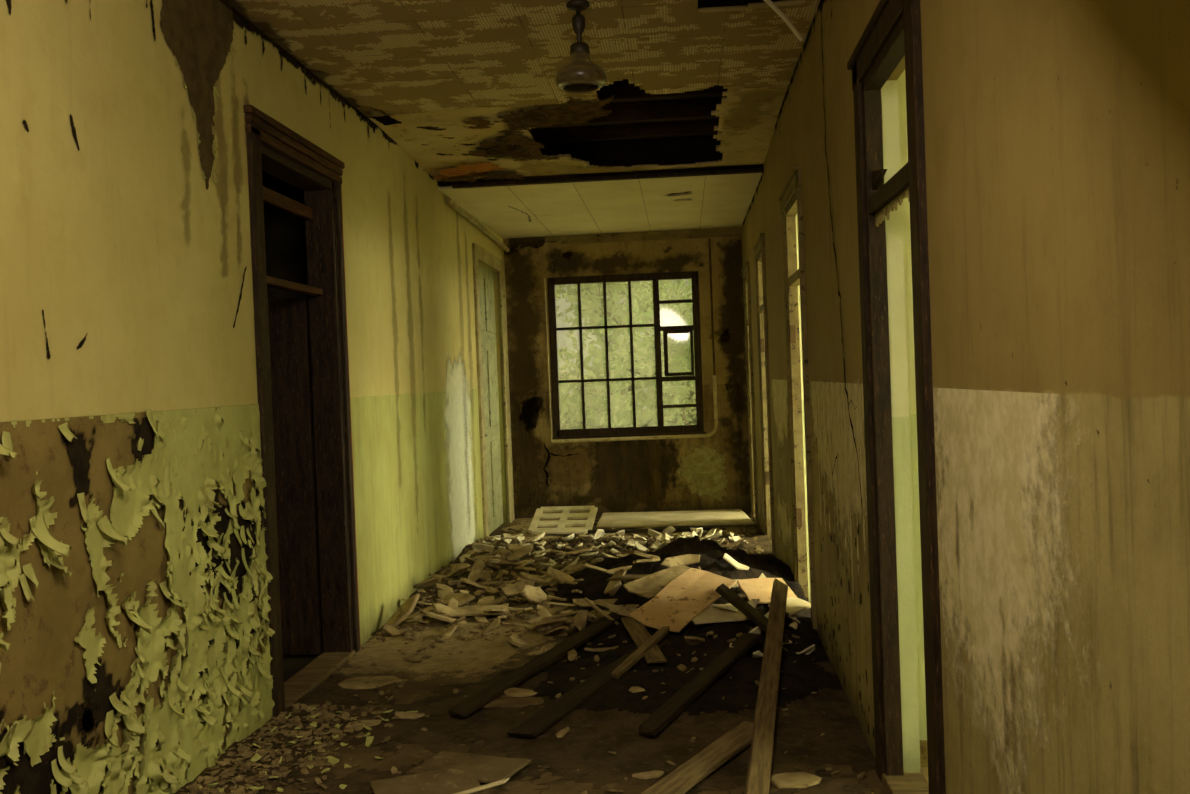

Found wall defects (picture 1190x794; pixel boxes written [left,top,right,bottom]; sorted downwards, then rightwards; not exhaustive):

water stain [146,0,156,41]
water stain [219,0,399,146]
spalling [416,95,615,162]
water stain [504,237,703,514]
water stain [710,173,763,495]
water stain [775,0,832,134]
crack [821,9,863,516]
peeling [0,404,275,794]